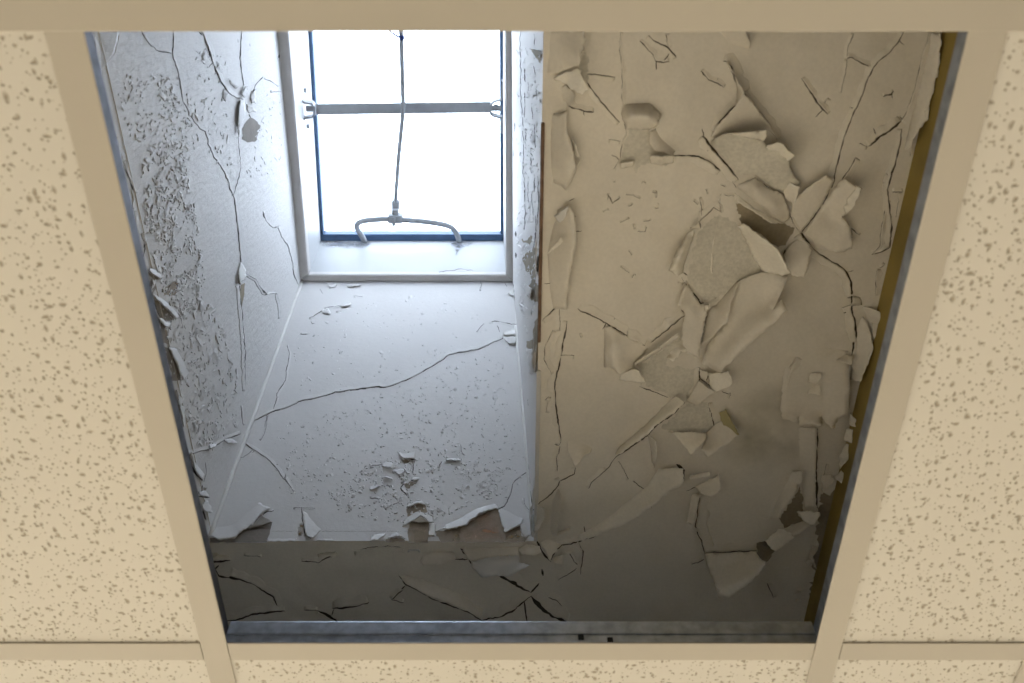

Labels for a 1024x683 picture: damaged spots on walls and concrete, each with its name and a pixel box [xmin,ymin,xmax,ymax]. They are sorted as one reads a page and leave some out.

crack [141,31,299,319]
spalling [222,78,261,142]
peeling [531,31,590,190]
peeling [148,268,189,427]
peeling [236,262,246,391]
crack [188,336,503,492]
spalling [505,231,538,302]
peeling [369,306,881,602]
peeling [586,53,862,489]
crack [215,565,404,621]
crack [482,527,594,621]